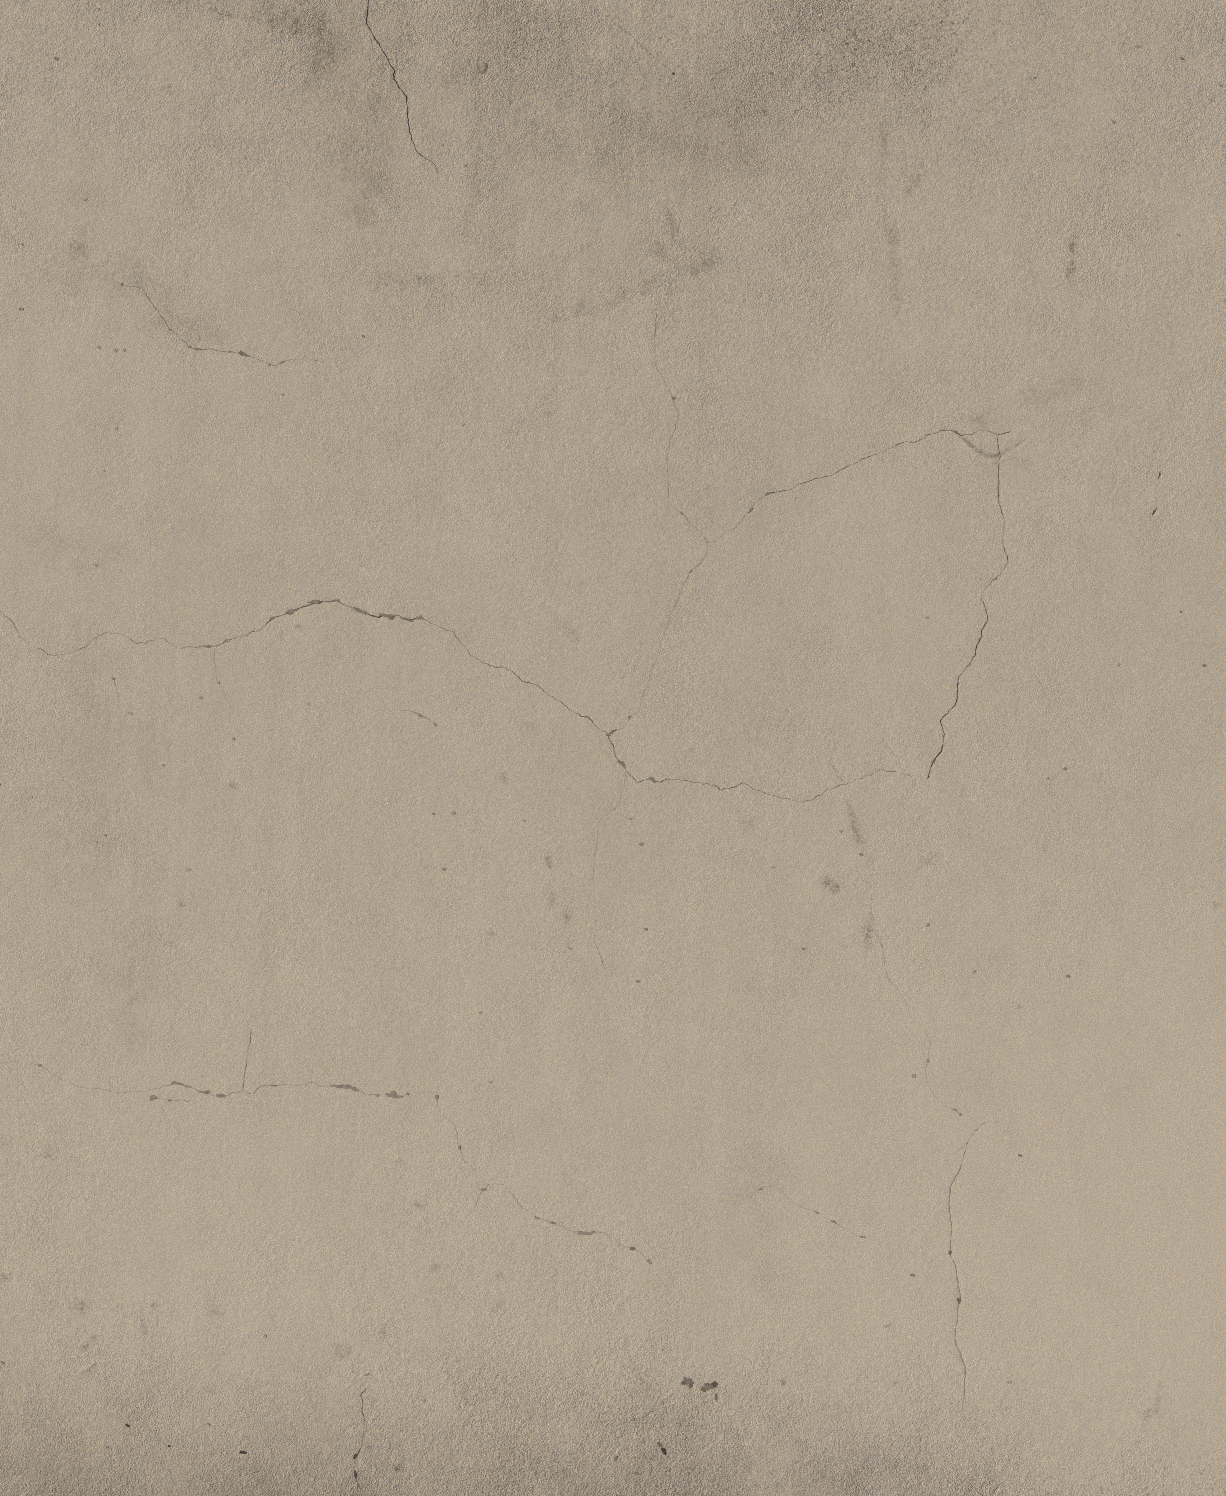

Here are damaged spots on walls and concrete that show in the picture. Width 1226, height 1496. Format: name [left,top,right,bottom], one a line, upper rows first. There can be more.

crack [361,0,438,172]
crack [120,283,324,366]
crack [3,377,1010,872]
crack [6,1033,652,1264]